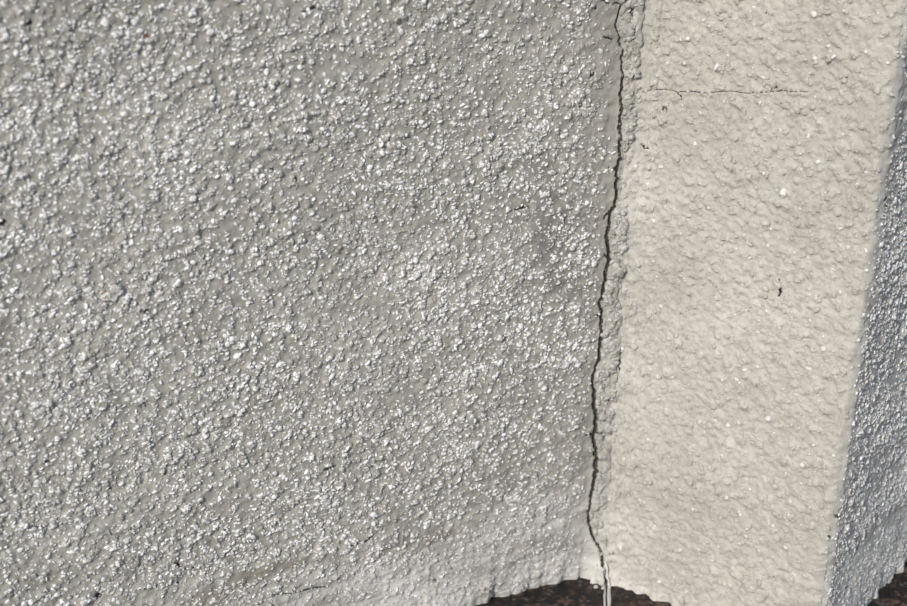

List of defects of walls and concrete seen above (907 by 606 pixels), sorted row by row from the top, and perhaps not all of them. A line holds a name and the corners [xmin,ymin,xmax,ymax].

crack [585,0,649,606]